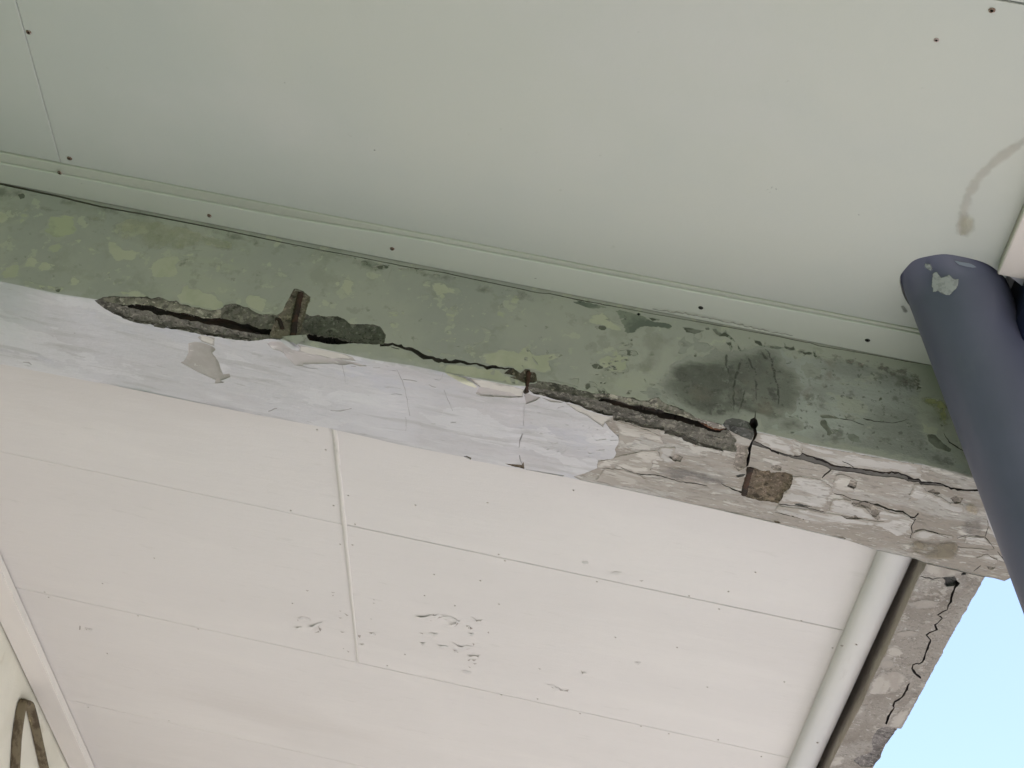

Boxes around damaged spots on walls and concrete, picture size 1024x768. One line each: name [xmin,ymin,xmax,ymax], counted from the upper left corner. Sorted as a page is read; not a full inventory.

spalling [95,289,386,383]
crack [342,343,512,423]
damp [573,299,823,433]
crack [617,465,741,493]
peeling [444,313,1010,587]
crack [746,412,1003,724]
peeling [868,631,919,694]